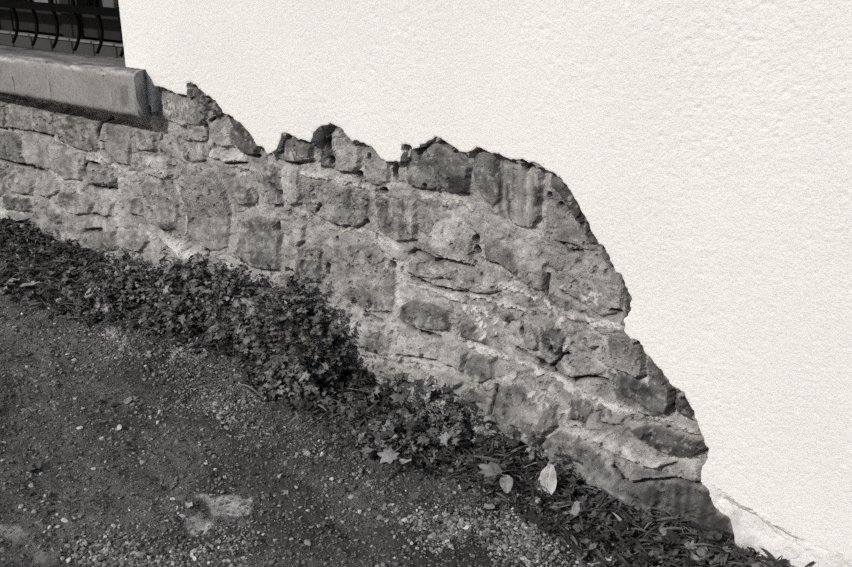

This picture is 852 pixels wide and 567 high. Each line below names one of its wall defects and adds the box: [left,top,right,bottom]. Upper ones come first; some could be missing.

spalling [0,82,734,534]